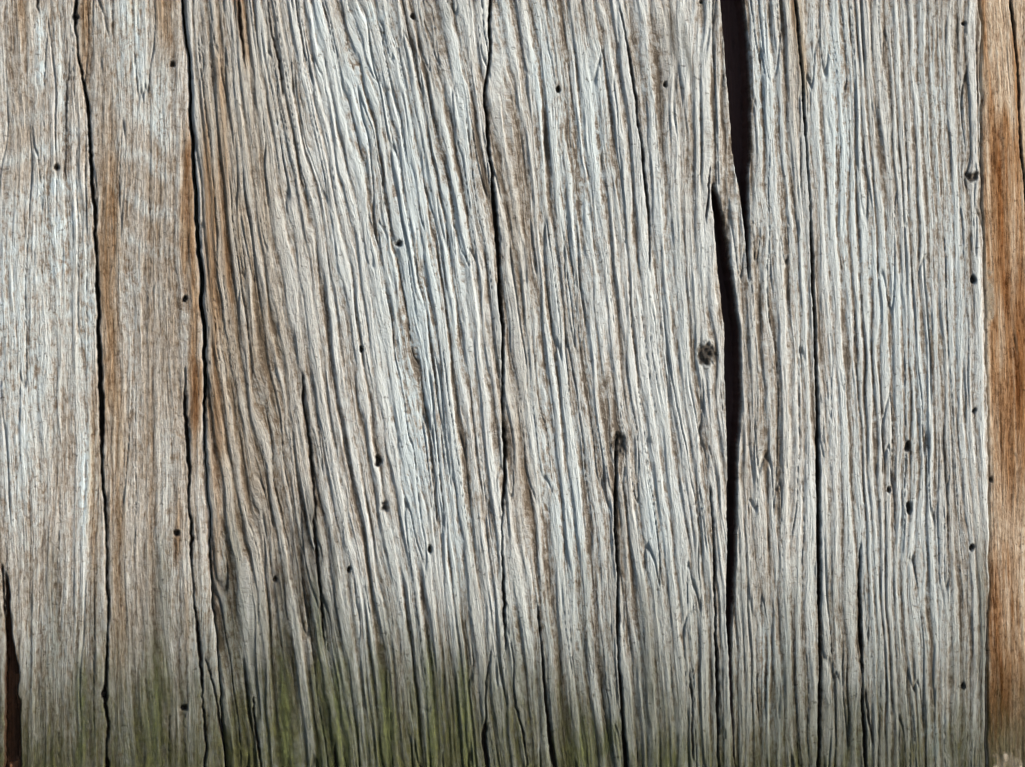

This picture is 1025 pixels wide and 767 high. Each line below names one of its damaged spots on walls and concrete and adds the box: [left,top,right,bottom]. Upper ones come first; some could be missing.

crack [65,0,110,767]
crack [483,0,506,511]
crack [689,0,750,767]
crack [1009,2,1025,210]
crack [481,722,489,767]
crack [499,548,507,631]
crack [613,451,628,767]